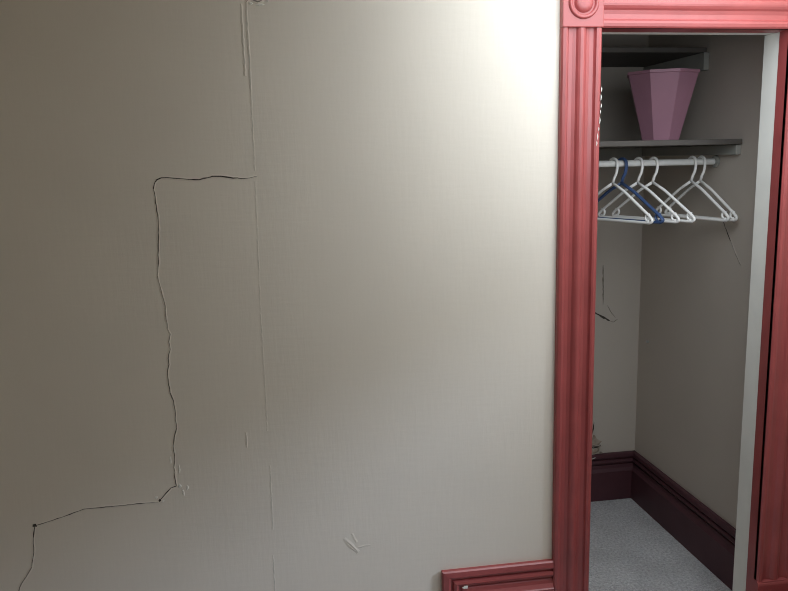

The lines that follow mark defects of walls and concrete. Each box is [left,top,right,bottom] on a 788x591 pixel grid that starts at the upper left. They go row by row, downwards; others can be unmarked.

crack [240,0,269,107]
crack [17,174,257,591]